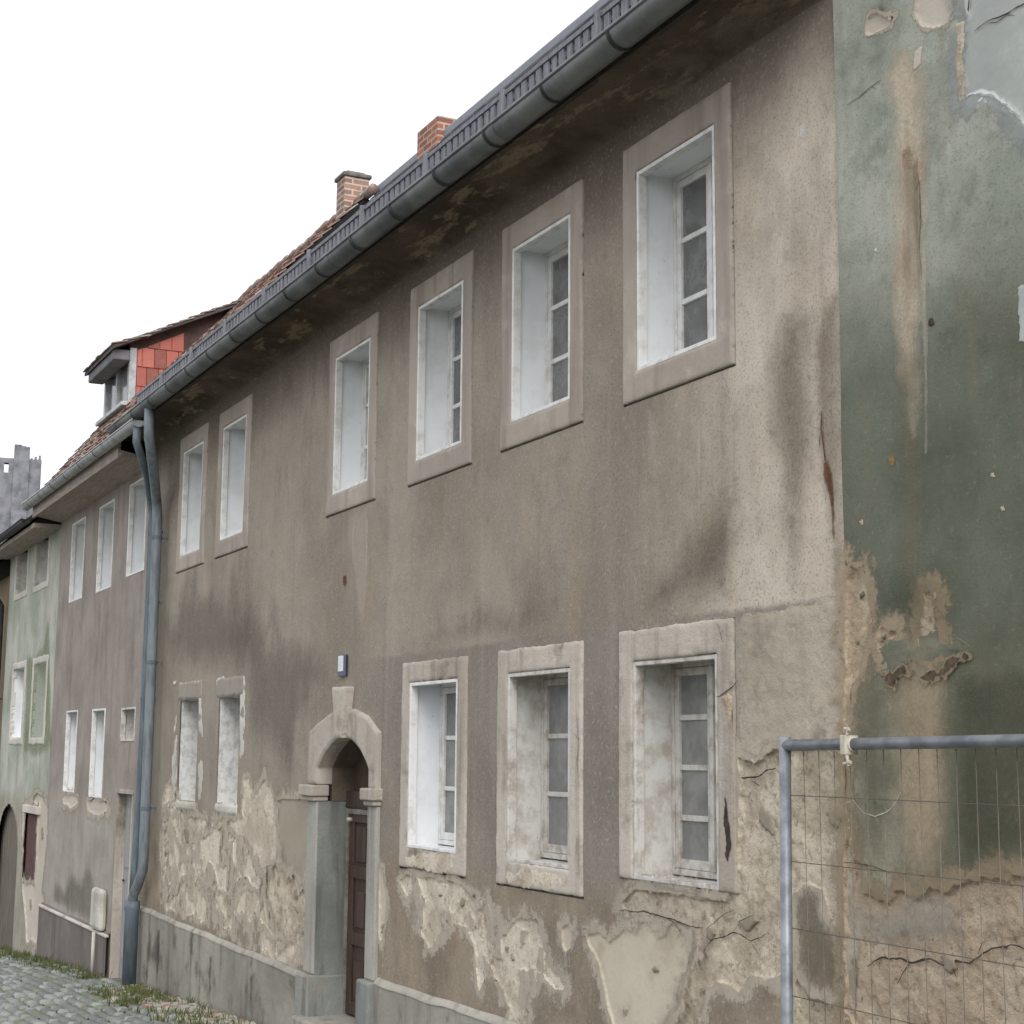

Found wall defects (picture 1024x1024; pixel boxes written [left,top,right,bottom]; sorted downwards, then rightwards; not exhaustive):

flaking render [863,7,898,38]
peeling [912,0,1024,153]
water stain [889,54,924,386]
corrosion [824,461,834,534]
peeling [158,676,308,970]
flaking render [378,541,1024,1024]
crack [621,909,766,953]
crack [867,942,1024,984]